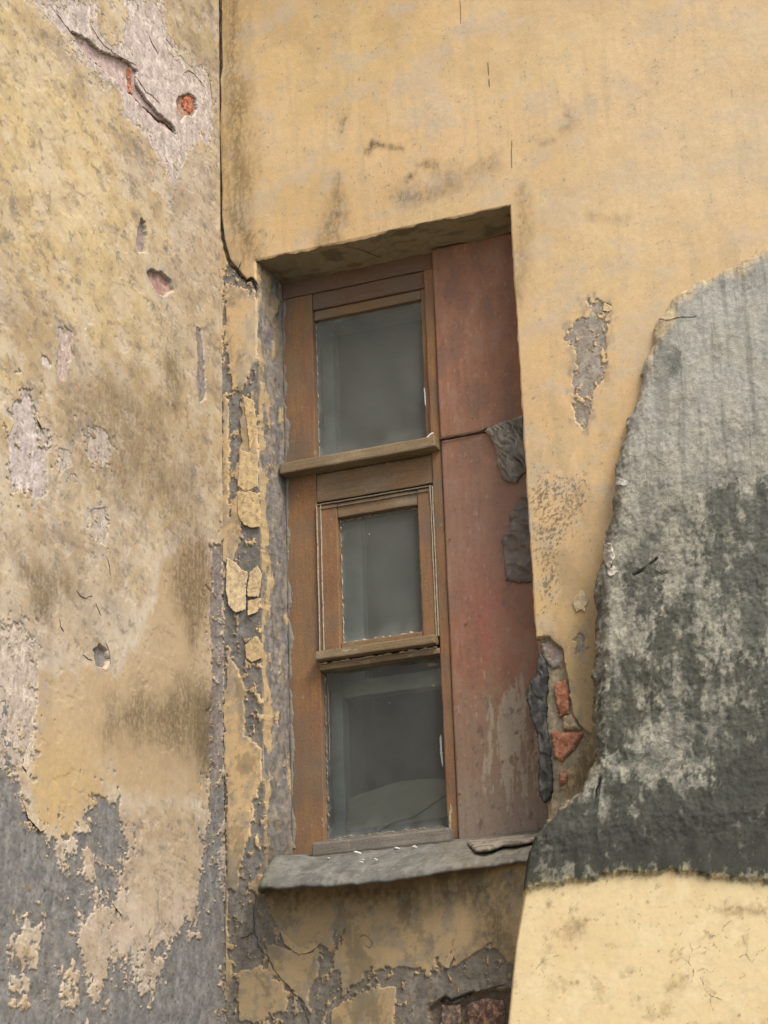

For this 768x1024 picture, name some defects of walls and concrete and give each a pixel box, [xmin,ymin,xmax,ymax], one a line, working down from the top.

crack [50,5,173,132]
peeling [24,0,219,204]
crack [184,0,259,291]
peeling [564,298,612,429]
peeling [0,266,514,1024]
flaking render [538,634,592,819]
peeling [573,590,588,612]